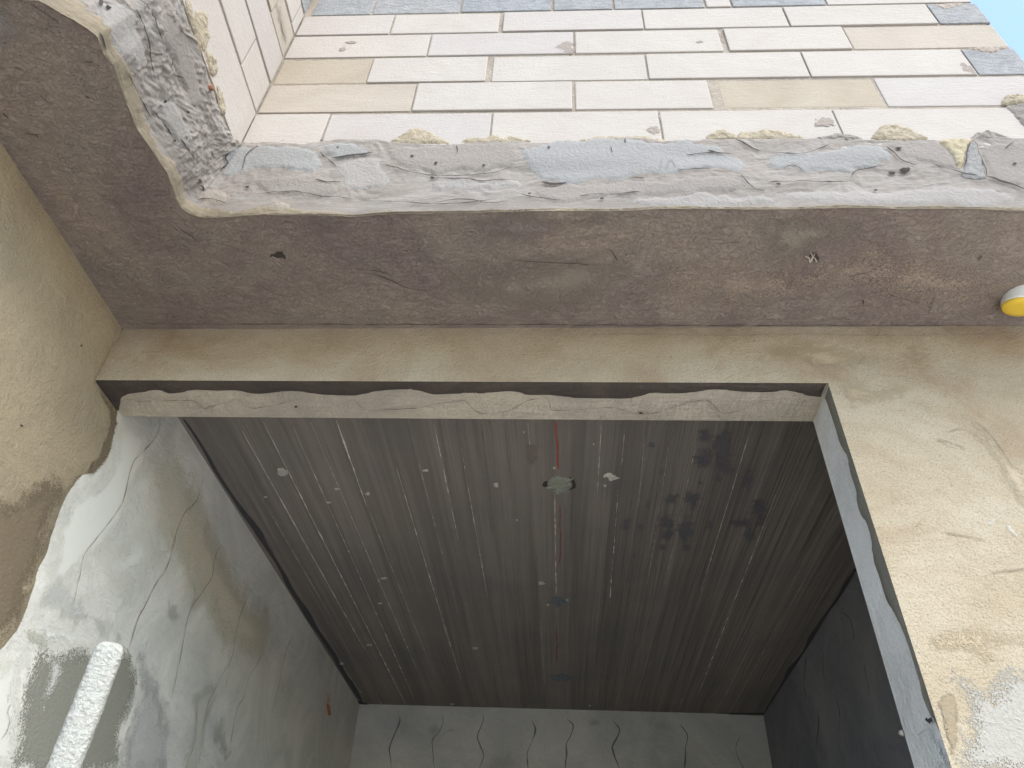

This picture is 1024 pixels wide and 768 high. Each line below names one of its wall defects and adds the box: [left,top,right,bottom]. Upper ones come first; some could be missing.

peeling [961,142,986,179]
damp [656,429,770,551]
damp [0,393,272,768]
crack [129,480,203,648]
crack [172,546,221,695]
crack [389,716,400,763]
crack [565,719,574,768]
crack [611,722,620,767]
peeling [917,659,1024,768]